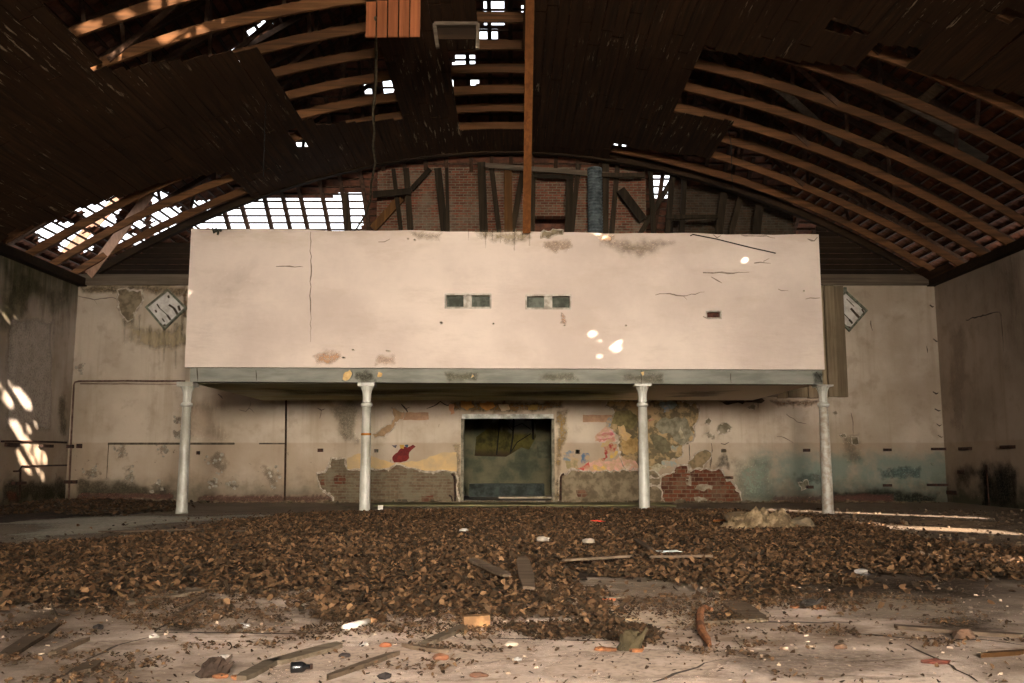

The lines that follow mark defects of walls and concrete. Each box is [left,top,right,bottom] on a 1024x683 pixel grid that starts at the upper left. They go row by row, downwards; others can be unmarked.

flaking render [540,229,564,239]
flaking render [116,286,144,323]
crack [276,232,312,342]
crack [656,234,772,318]
flaking render [558,400,742,502]
flaking render [198,452,460,502]
leakage [958,466,1016,507]